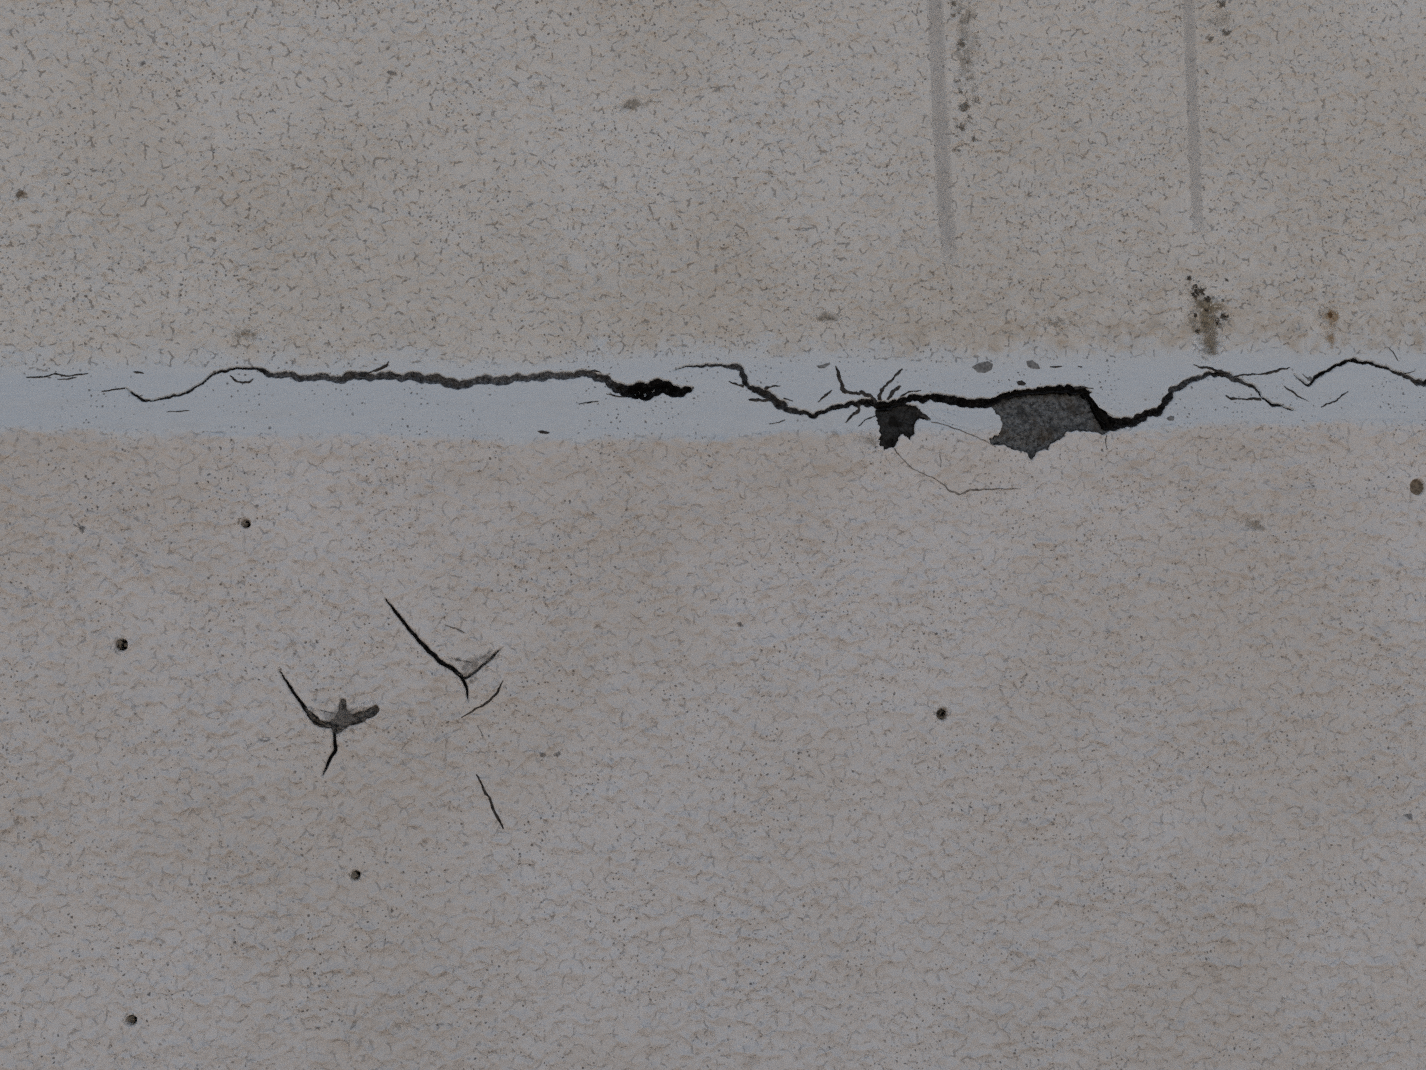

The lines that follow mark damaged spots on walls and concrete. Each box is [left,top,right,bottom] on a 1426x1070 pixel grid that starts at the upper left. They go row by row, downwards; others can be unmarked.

crack [102,347,1426,495]
spalling [875,360,1123,460]
crack [385,599,503,737]
crack [279,671,379,774]
crack [476,774,504,829]